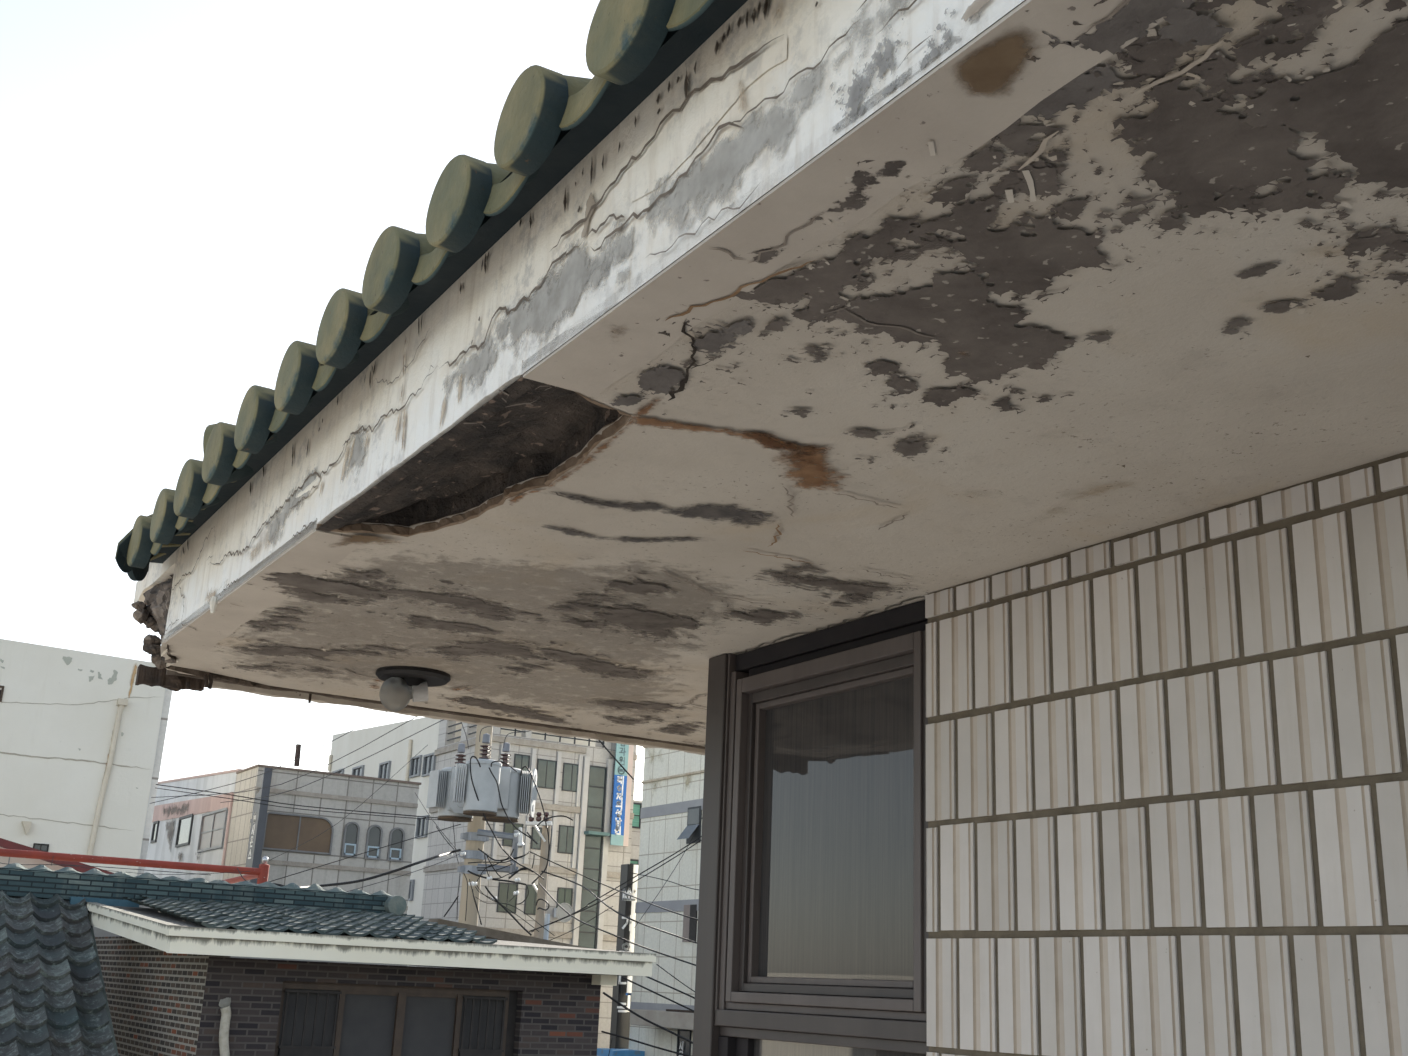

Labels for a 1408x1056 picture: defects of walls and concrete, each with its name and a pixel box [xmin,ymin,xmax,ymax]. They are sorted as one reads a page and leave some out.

damp [646,0,981,233]
damp [958,33,1032,95]
crack [1018,131,1059,170]
peeling [689,0,1408,414]
crack [1130,41,1222,97]
damp [440,221,633,426]
crack [163,0,934,631]
spalling [316,361,690,537]
damp [557,493,772,528]
rust [510,399,845,503]
peeling [131,569,703,692]
peeling [715,560,909,626]